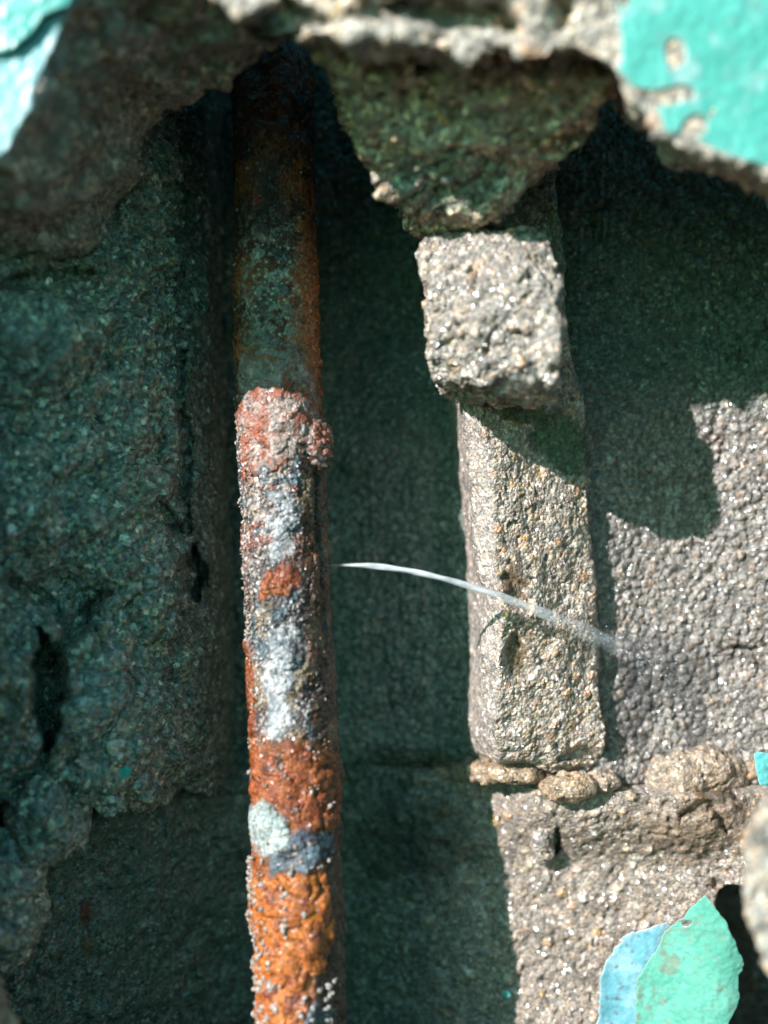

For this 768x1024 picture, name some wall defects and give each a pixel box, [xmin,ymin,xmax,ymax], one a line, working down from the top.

spalling [0,0,768,798]
peeling [596,895,744,1024]